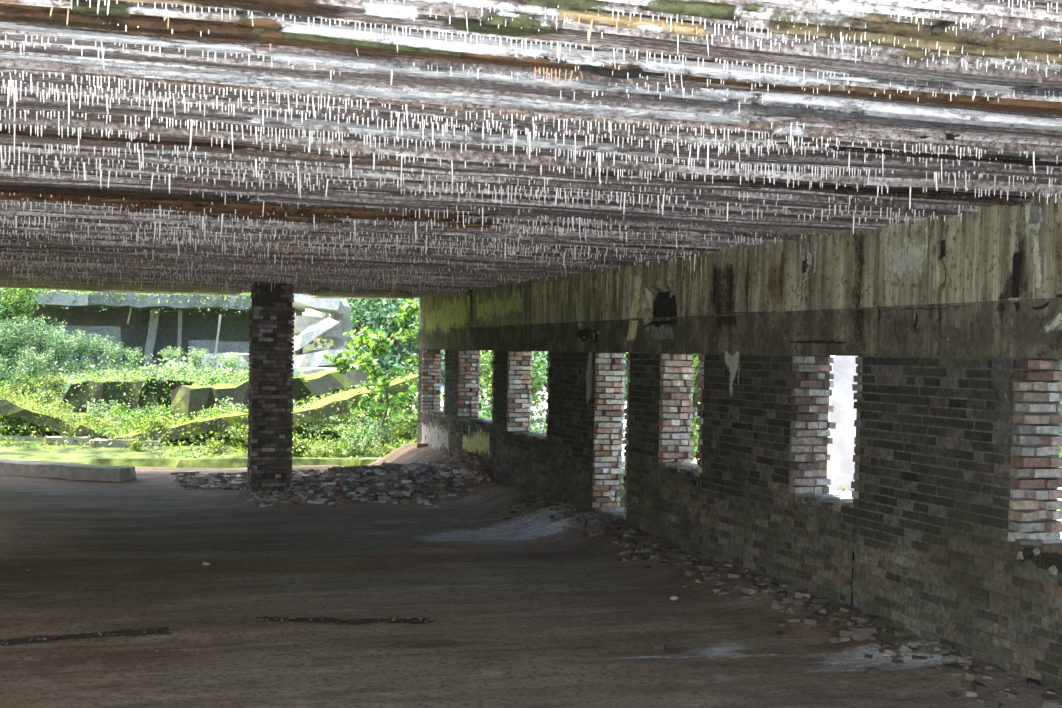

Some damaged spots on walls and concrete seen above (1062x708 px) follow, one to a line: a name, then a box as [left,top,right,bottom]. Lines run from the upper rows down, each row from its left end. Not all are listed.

spalling [930,21,956,36]
leakage [0,0,1062,146]
leakage [214,114,674,158]
leakage [839,147,964,160]
leakage [979,158,1062,167]
leakage [0,187,252,202]
leakage [884,225,928,284]
leakage [998,203,1043,318]
leakage [682,257,749,329]
leakage [853,234,865,342]
crack [0,627,173,646]